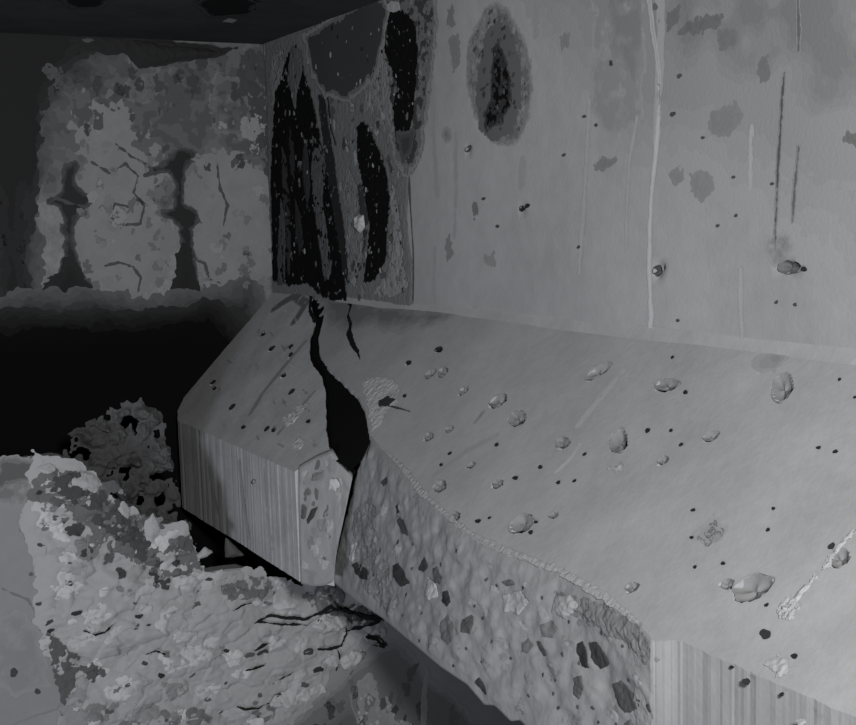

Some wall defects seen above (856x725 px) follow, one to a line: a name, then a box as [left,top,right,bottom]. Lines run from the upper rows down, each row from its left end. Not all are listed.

crack [48,143,155,226]
crack [216,163,229,226]
crack [104,261,142,292]
crack [192,258,221,284]
leakage [0,0,856,577]
crack [308,296,370,470]
spalling [19,376,659,725]
hole [828,542,849,568]
crack [233,602,385,711]